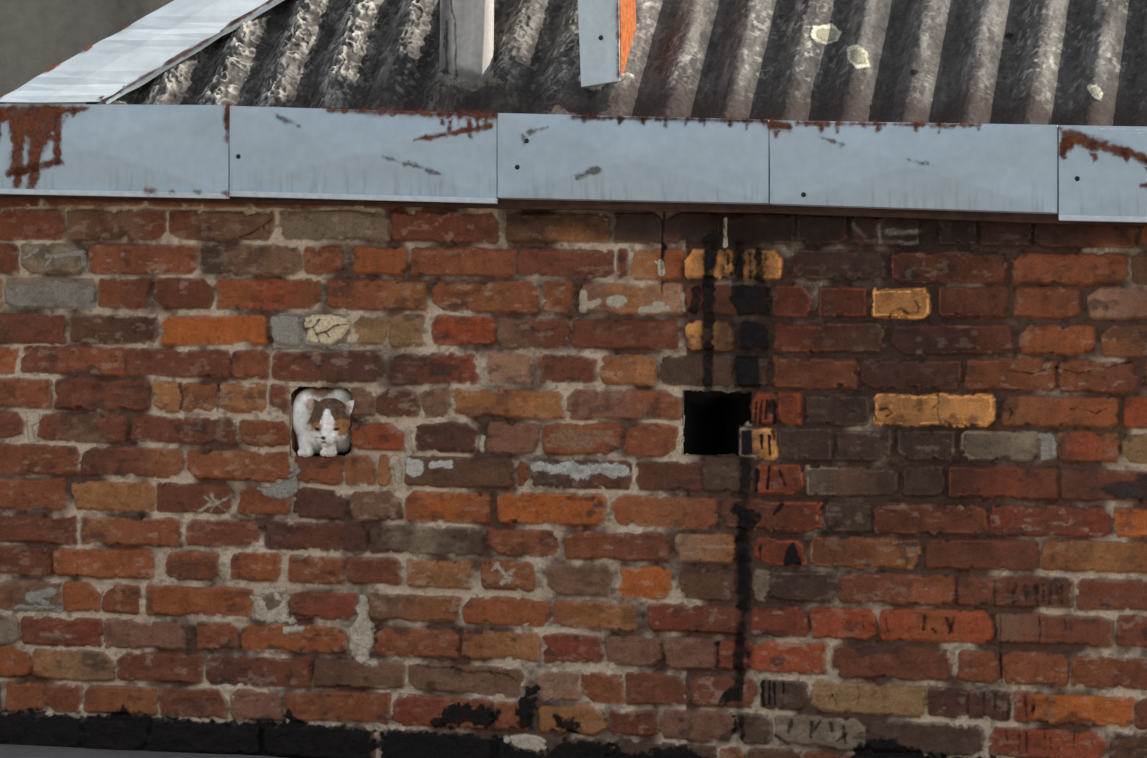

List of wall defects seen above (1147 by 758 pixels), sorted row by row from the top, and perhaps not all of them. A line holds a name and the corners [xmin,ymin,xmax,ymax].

rust [102,0,273,102]
rust [617,0,636,81]
rust [0,94,88,189]
rust [327,108,498,140]
rust [1059,130,1147,169]
crack [305,319,346,342]
water stain [659,215,767,395]
spalling [683,390,752,456]
water stain [758,399,777,455]
water stain [730,502,784,530]
water stain [719,687,745,740]
water stain [810,721,848,742]